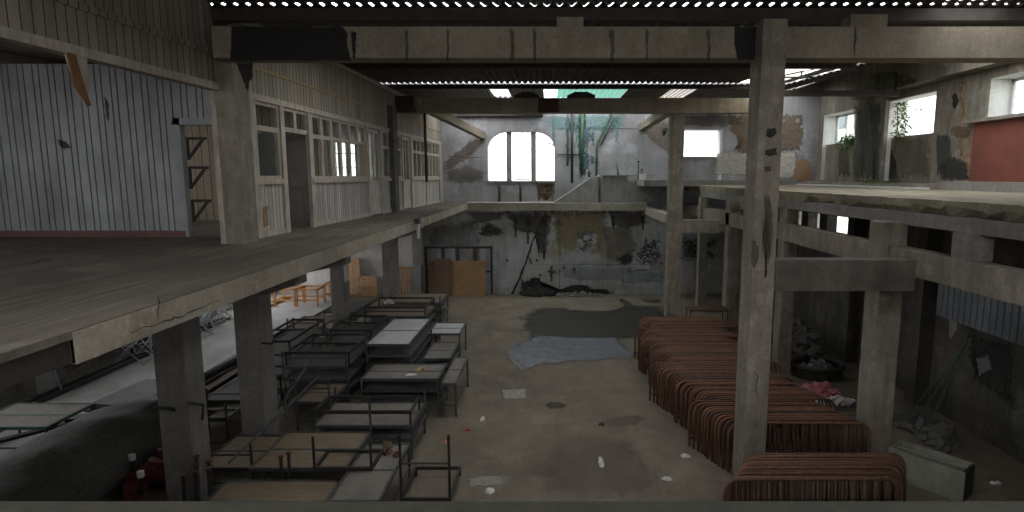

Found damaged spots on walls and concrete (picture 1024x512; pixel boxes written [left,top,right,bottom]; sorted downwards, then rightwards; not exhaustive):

damp [552,119,578,166]
spalling [765,114,814,180]
damp [471,211,664,288]
crack [129,296,220,333]
peeling [976,356,991,376]